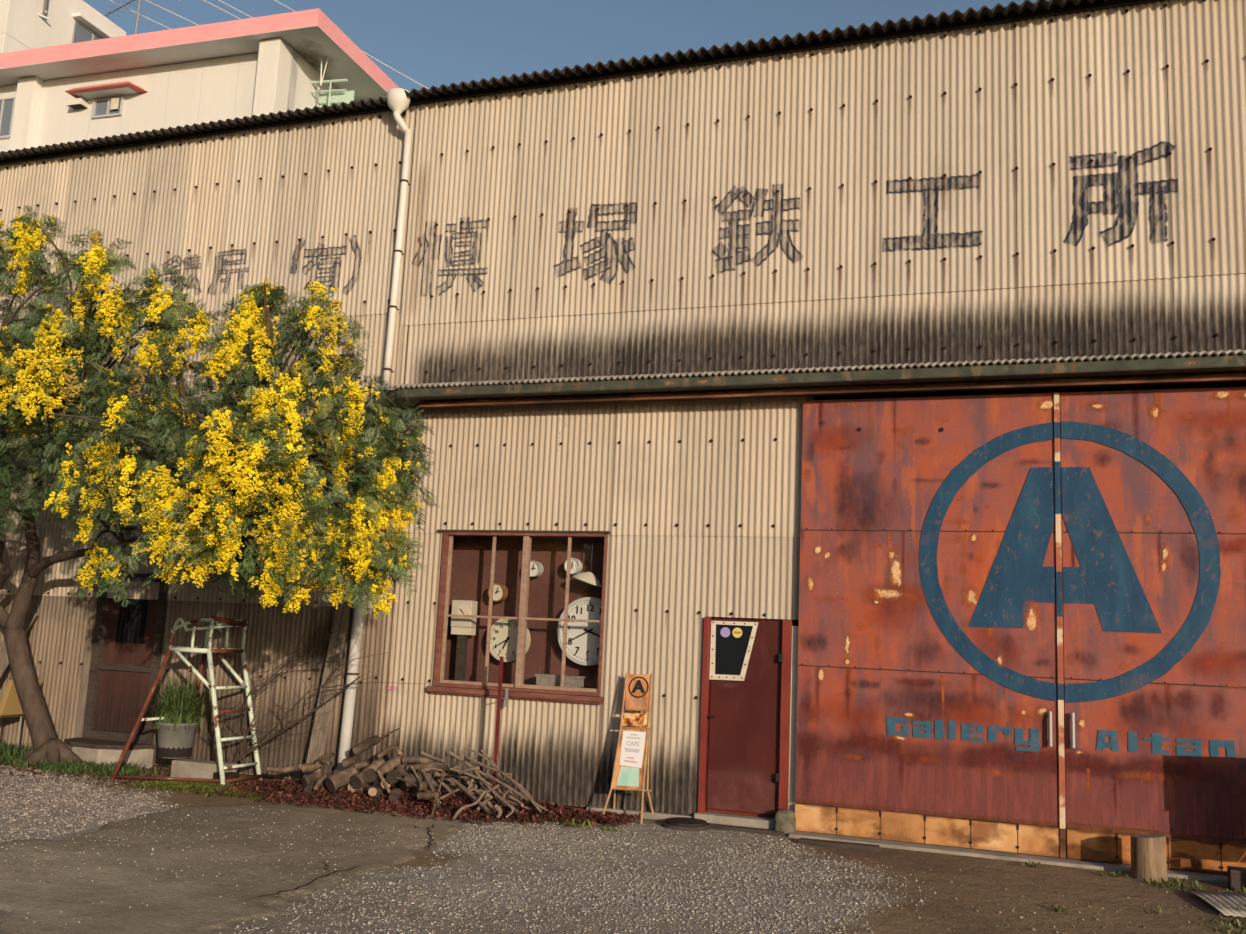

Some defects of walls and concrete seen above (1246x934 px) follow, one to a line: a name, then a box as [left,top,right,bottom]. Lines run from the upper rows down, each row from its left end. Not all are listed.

damp [418,300,1246,388]
peeling [873,551,911,603]
peeling [1025,609,1038,630]
damp [134,706,311,778]
damp [353,722,697,816]